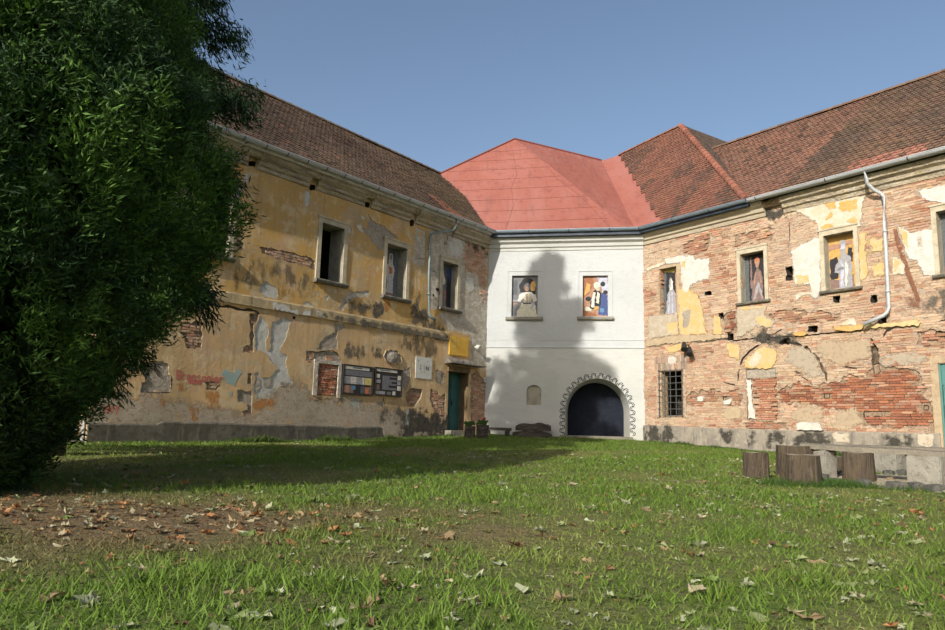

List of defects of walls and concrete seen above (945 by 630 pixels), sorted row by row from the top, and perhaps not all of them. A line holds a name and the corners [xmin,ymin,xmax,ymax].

flaking render [259,246,315,269]
water stain [234,263,308,290]
flaking render [180,321,203,349]
crack [204,304,260,314]
peeling [237,281,369,418]
flaking render [410,219,489,426]
spalling [646,196,945,447]
flaking render [140,361,173,393]
flaking render [402,367,446,419]
water stain [87,382,449,437]
water stain [767,431,830,450]
water stain [883,435,912,446]